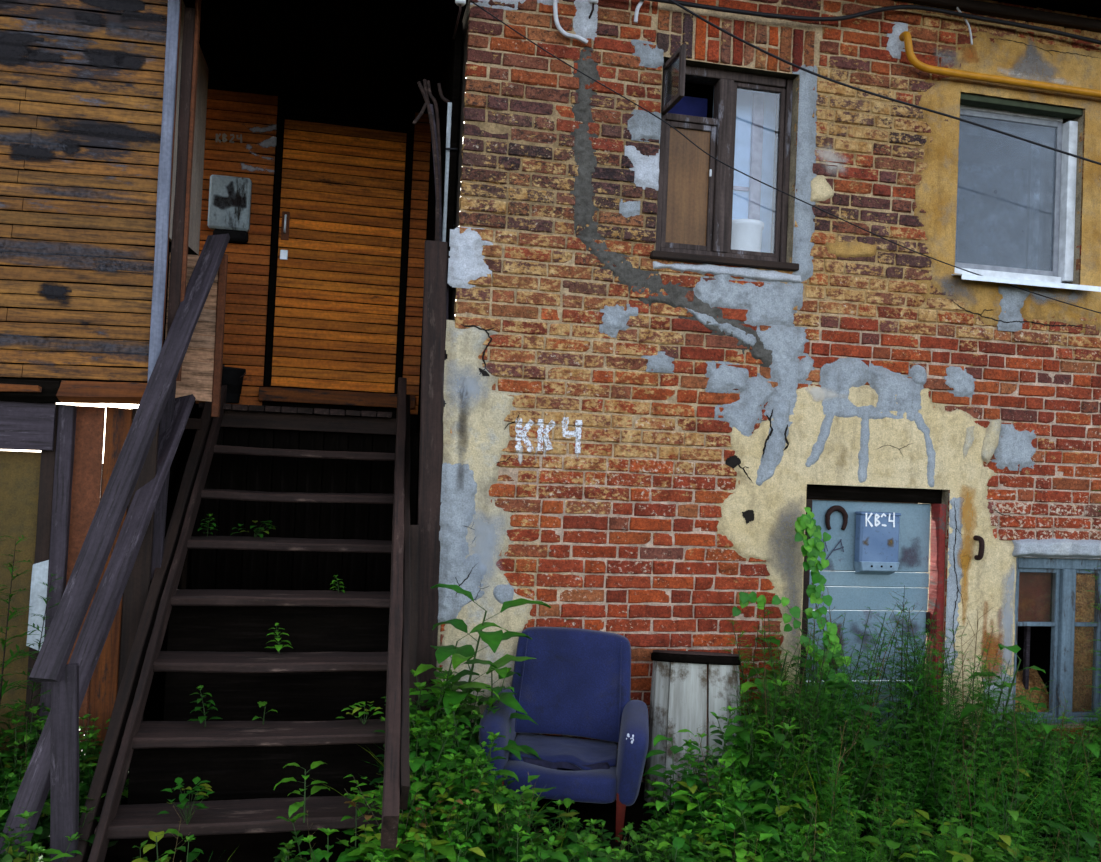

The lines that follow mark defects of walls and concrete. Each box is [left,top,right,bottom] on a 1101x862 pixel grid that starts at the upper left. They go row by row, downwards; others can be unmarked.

crack [570,47,773,367]
peeling [810,175,835,203]
peeling [821,239,877,261]
crack [738,409,789,483]
corrosion [959,492,974,600]